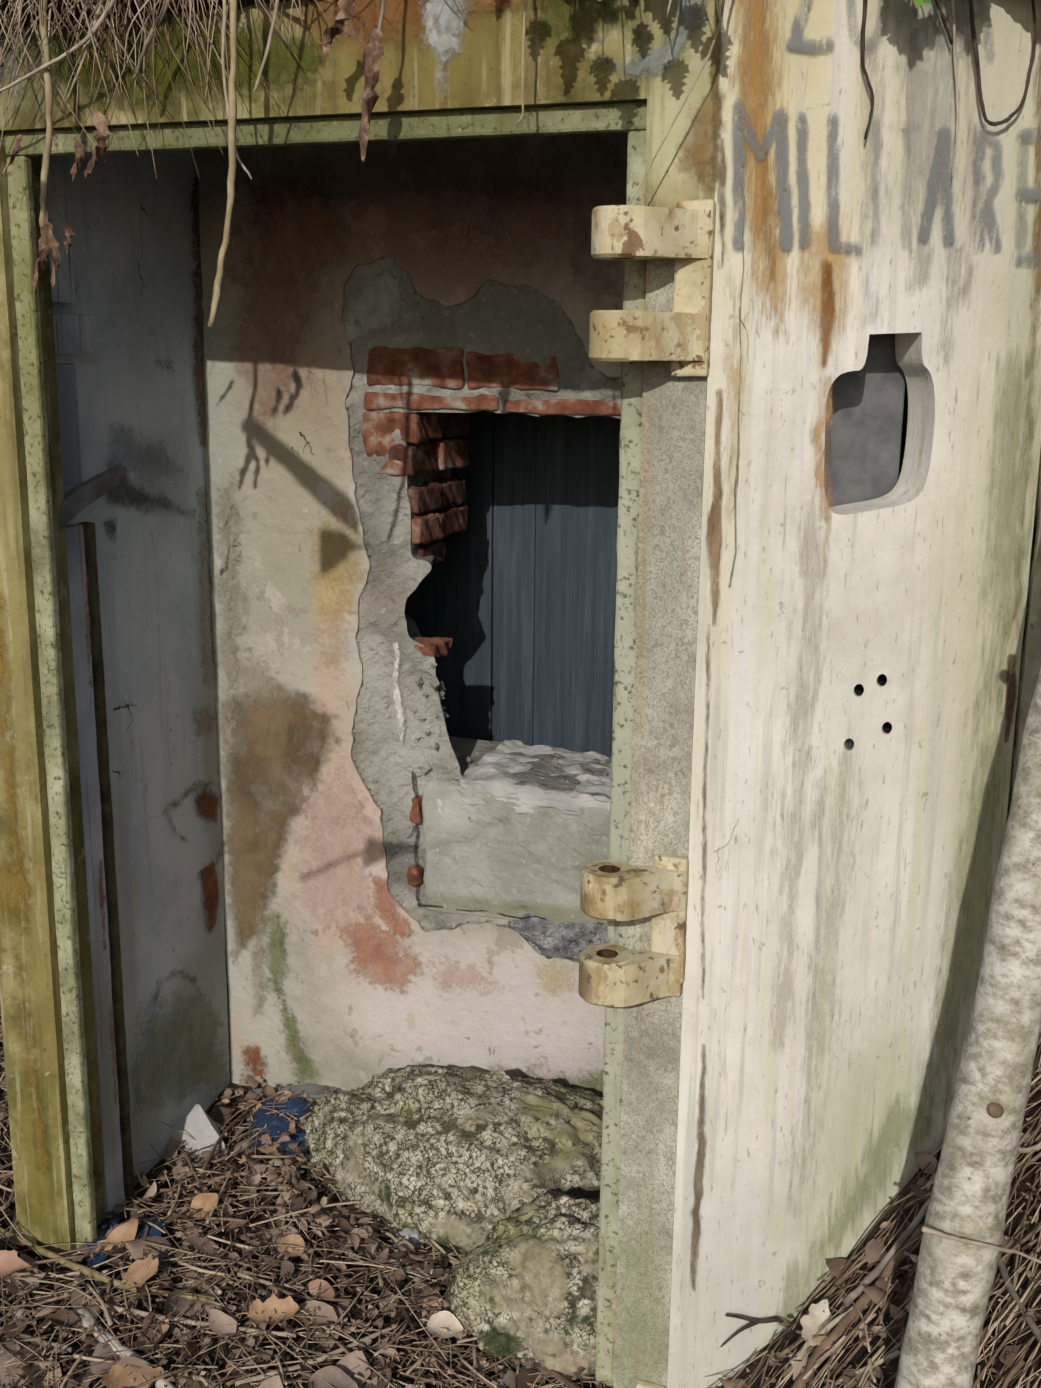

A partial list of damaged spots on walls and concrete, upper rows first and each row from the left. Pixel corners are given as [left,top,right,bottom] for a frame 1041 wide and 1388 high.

rust [680,0,844,365]
flaking render [342,256,621,962]
leakage [205,662,337,1007]